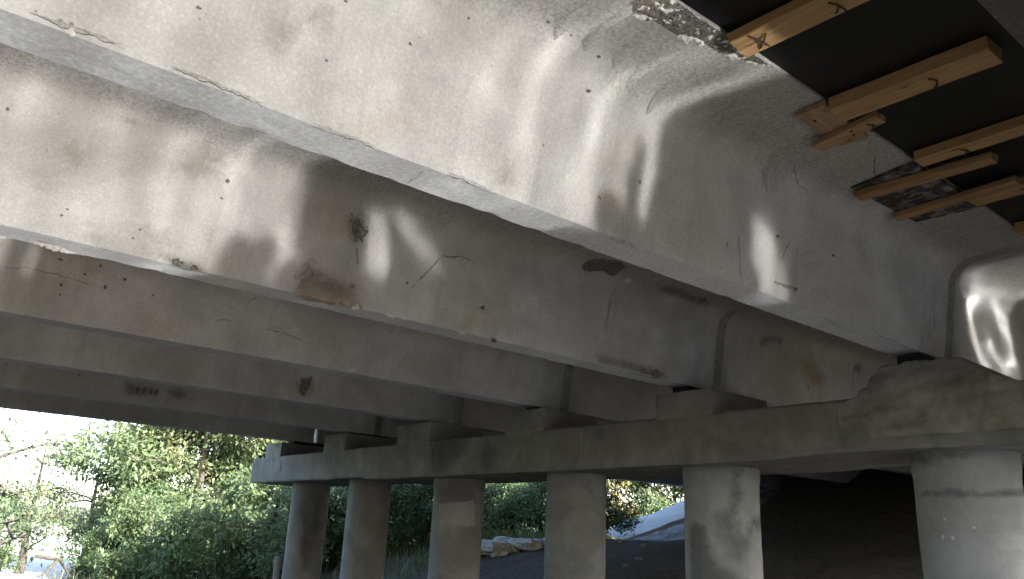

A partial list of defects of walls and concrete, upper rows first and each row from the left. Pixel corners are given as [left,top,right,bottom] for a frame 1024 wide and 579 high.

peeling [628,0,773,68]
spalling [350,213,369,242]
spalling [581,258,632,284]